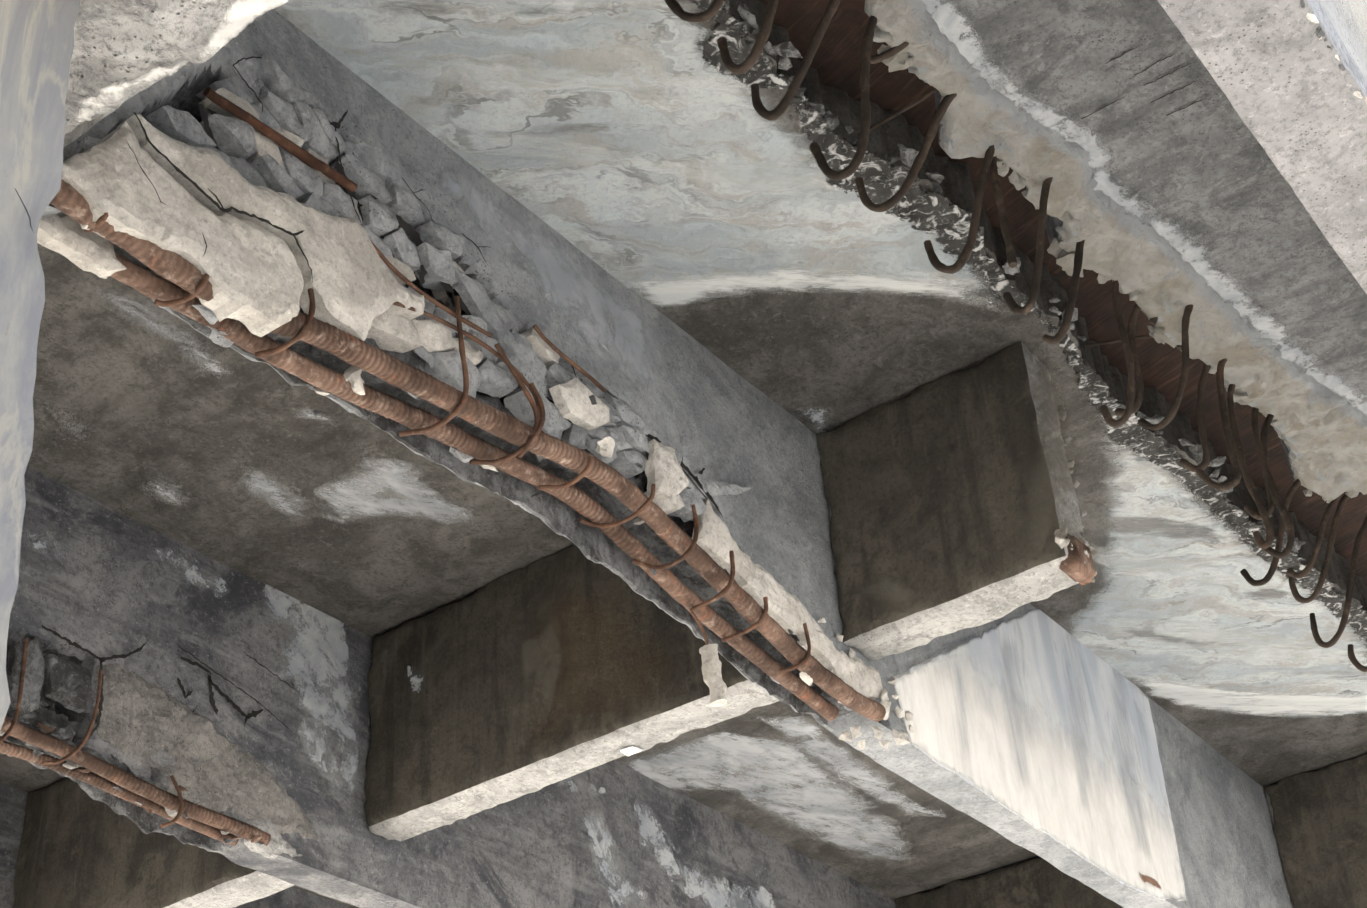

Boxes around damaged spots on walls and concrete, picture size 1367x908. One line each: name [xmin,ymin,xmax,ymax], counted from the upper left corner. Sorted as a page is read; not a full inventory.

crack [197,103,224,149]
crack [128,112,313,288]
crack [232,56,263,112]
leakage [206,0,1057,333]
spalling [664,0,963,212]
leakage [864,0,1367,503]
spalling [37,40,915,750]
spalling [1099,280,1367,672]
spalling [0,637,320,860]
crack [42,625,304,739]
leakage [632,718,938,859]
leakage [894,334,1367,899]